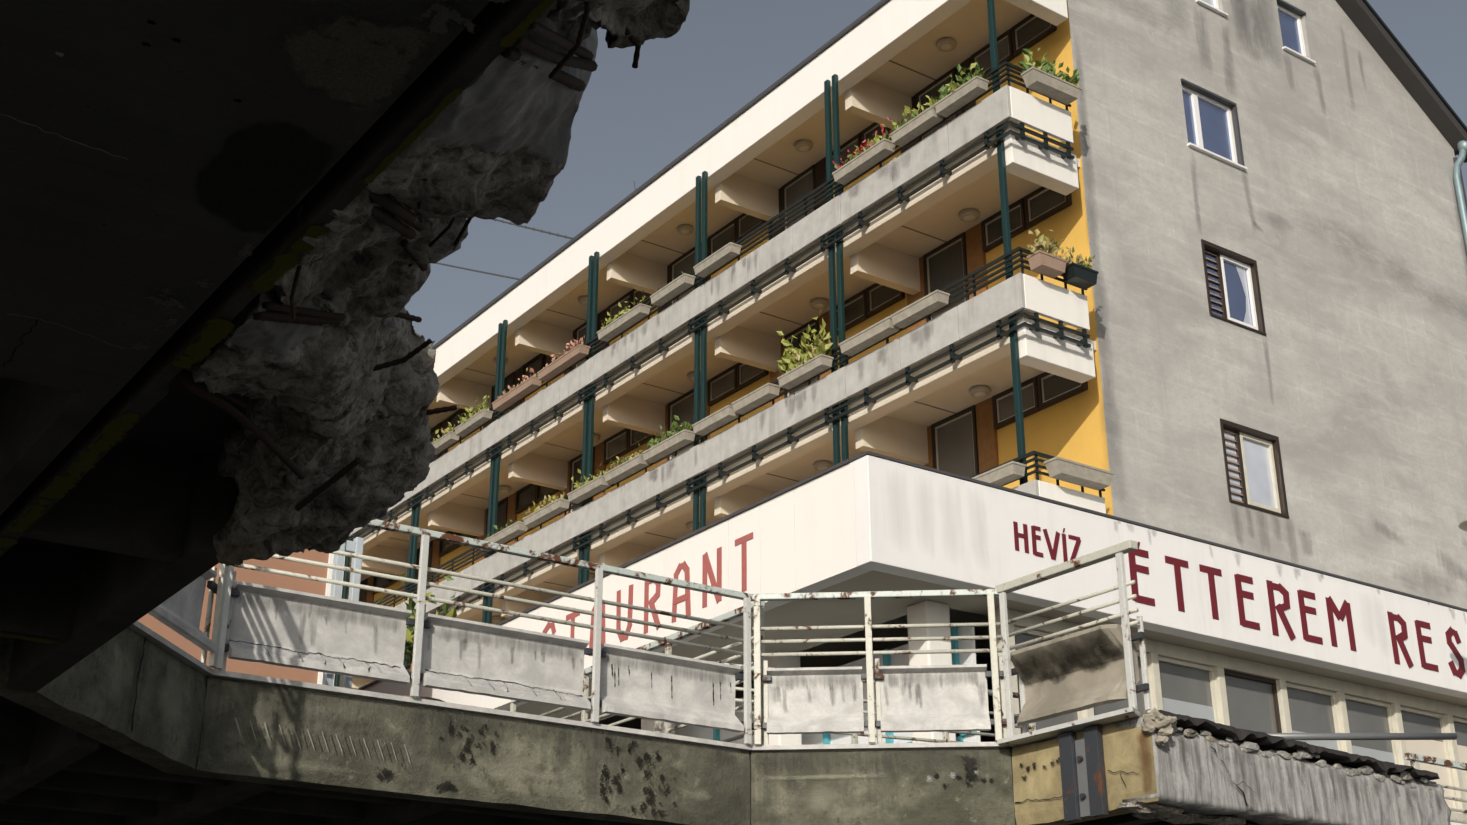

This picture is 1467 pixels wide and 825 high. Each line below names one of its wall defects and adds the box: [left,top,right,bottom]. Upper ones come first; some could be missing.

spalling [176,0,690,566]
damp [376,766,394,781]
damp [436,715,502,792]
damp [600,736,677,816]
spalling [1117,800,1253,825]
spalling [1141,707,1432,790]